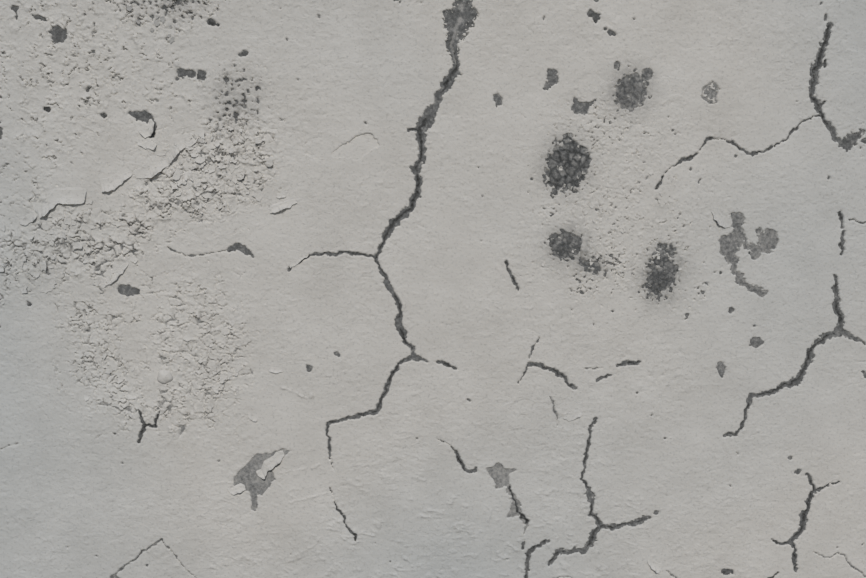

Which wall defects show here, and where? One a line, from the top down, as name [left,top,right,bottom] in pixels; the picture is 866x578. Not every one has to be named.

peeling [11,1,123,87]
peeling [0,50,297,306]
peeling [70,277,253,435]
peeling [106,0,226,81]
crack [287,0,478,467]
crack [517,337,641,426]
peeling [709,212,779,297]
crack [655,22,865,190]
crack [723,211,866,437]
peeling [228,448,290,511]
crack [509,417,651,578]
crack [767,473,866,578]